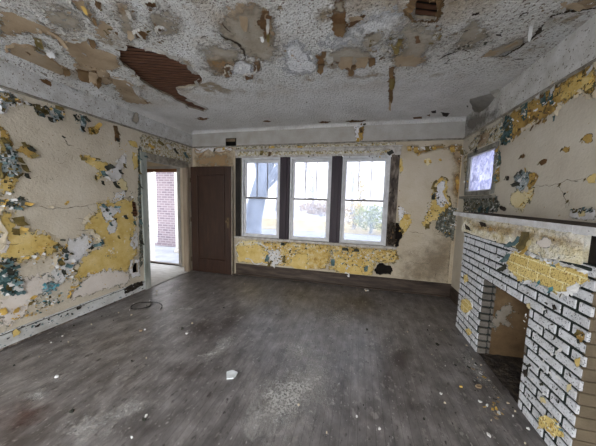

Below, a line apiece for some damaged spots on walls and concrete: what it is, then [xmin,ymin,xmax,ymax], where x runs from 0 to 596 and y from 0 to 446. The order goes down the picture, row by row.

peeling [0,0,199,107]
crack [201,23,246,62]
peeling [216,0,437,111]
peeling [0,88,65,122]
peeling [73,114,102,135]
peeling [422,62,596,240]
peeling [0,120,412,337]
peeling [477,232,590,298]
peeling [459,296,473,317]